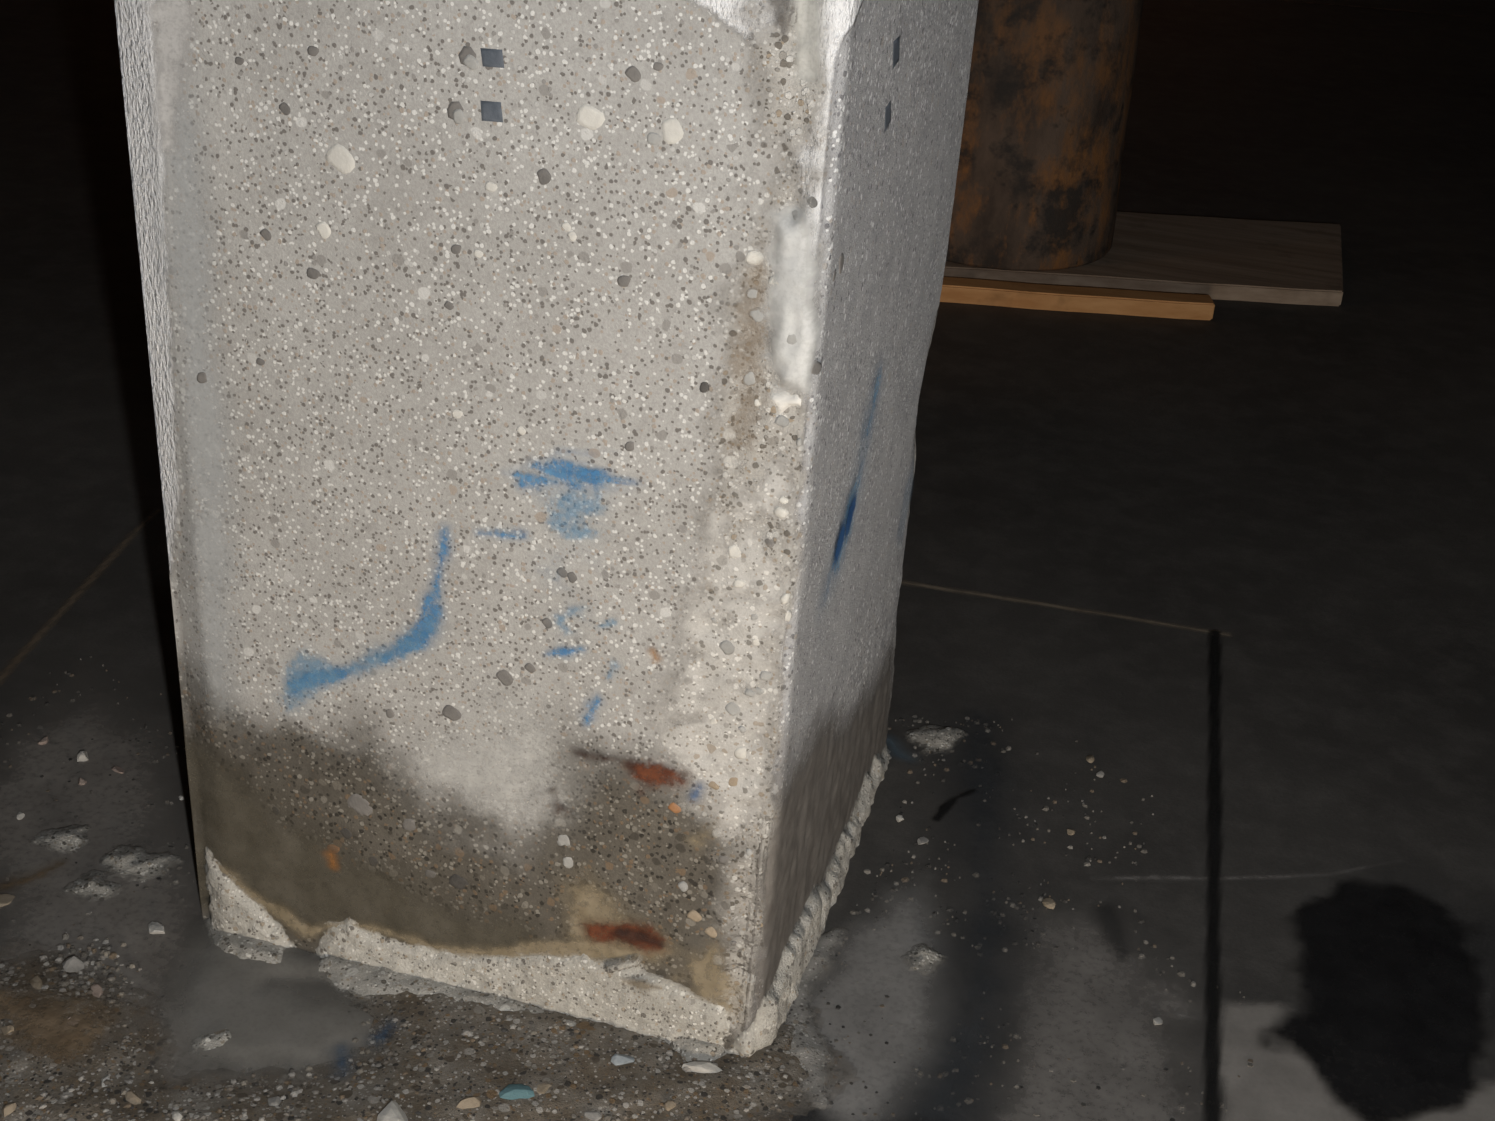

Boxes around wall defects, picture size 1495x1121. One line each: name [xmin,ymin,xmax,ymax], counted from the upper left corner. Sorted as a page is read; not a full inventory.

peeling [151,0,979,1073]
rust [625,762,685,785]
damp [180,654,893,1050]
rust [571,885,669,960]
rust [688,947,737,1009]